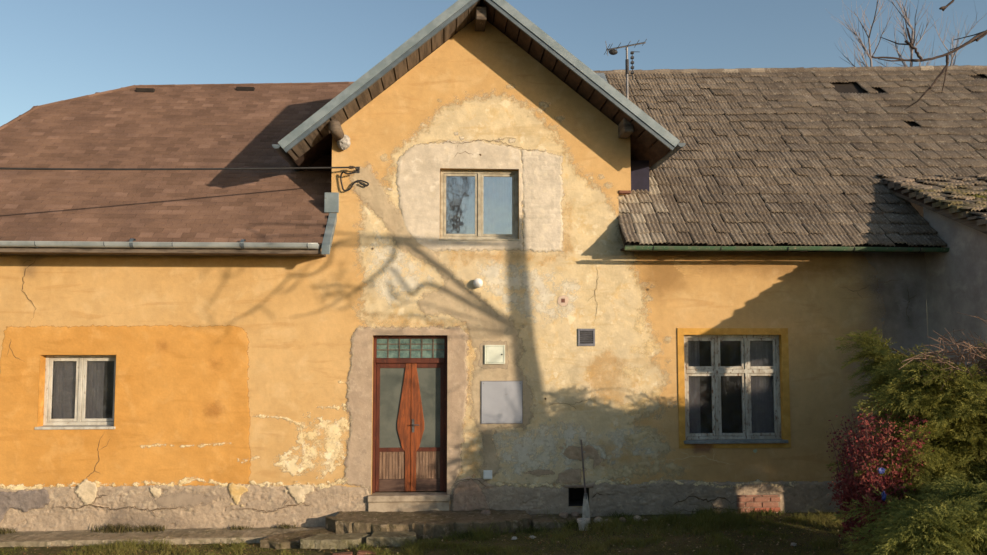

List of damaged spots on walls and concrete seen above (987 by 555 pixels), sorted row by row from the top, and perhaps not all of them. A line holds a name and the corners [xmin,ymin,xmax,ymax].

peeling [354,85,799,513]
peeling [0,482,80,491]
crack [47,434,188,514]
peeling [95,403,350,492]